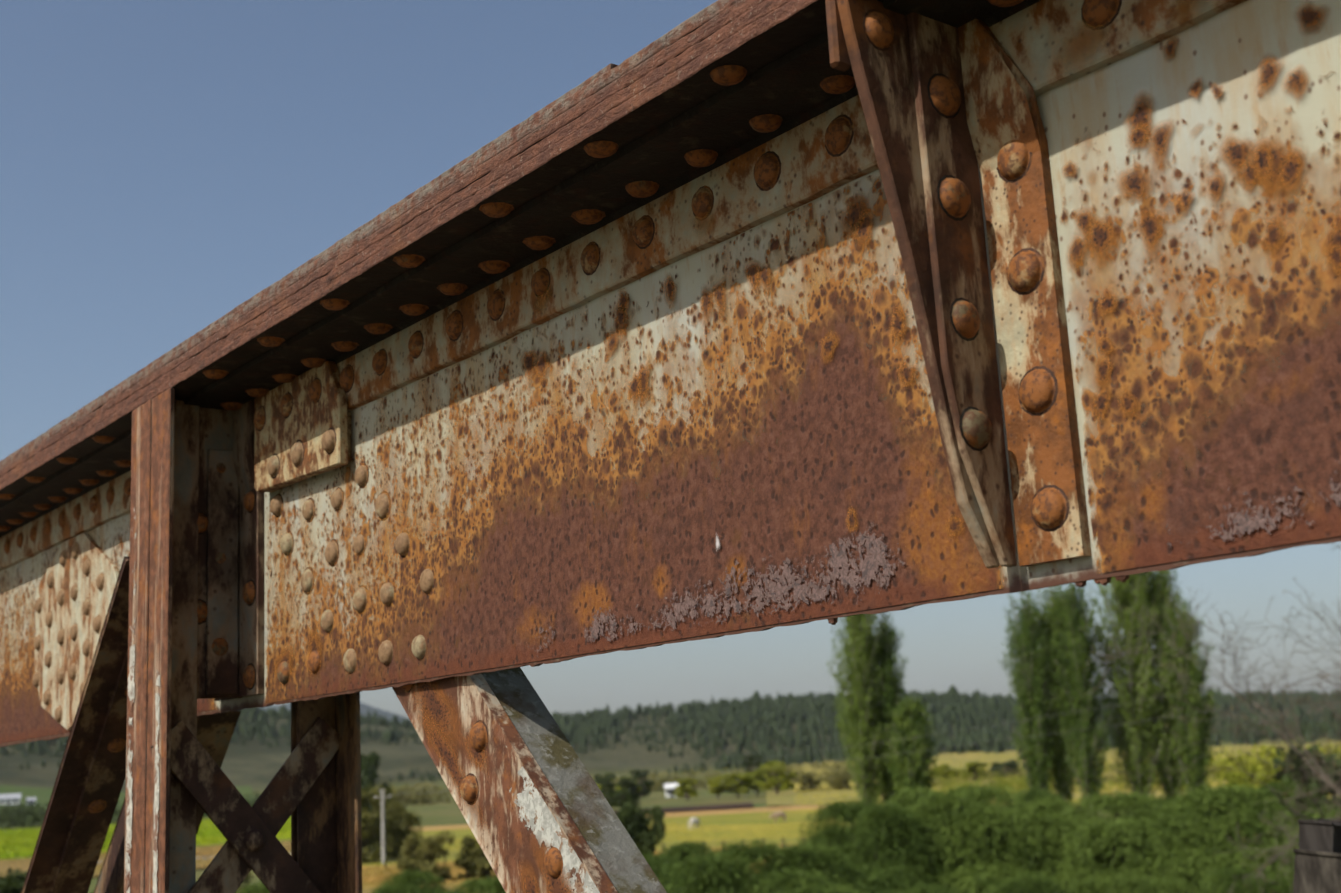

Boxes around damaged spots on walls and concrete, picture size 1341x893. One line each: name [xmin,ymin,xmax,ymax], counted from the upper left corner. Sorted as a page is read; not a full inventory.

rust [1298,5,1324,30]
rust [1189,79,1222,98]
rust [1258,58,1307,111]
rust [1061,98,1341,587]
rust [265,175,1004,814]
peeling [1166,458,1341,554]
peeling [584,521,907,643]
rust [0,548,71,744]
rust [197,698,218,713]
rust [521,851,572,893]